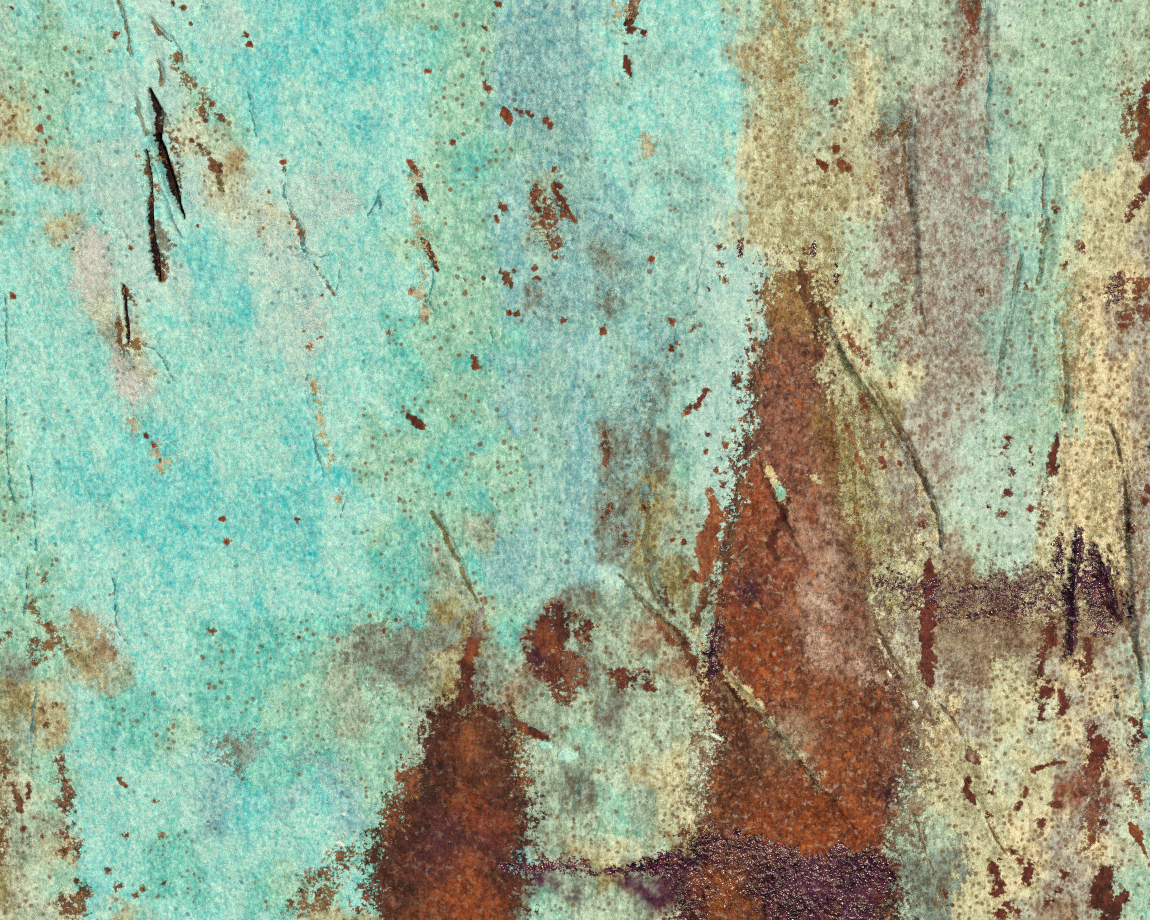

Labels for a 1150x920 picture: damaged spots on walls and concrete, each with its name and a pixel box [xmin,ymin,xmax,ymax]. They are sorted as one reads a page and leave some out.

rust [953,0,987,91]
crack [97,0,258,283]
rust [1111,73,1150,225]
rust [493,202,509,224]
rust [525,166,578,260]
crack [113,284,174,381]
rust [25,573,71,669]
rust [280,237,1150,920]
rust [0,727,88,888]
rust [52,878,99,920]